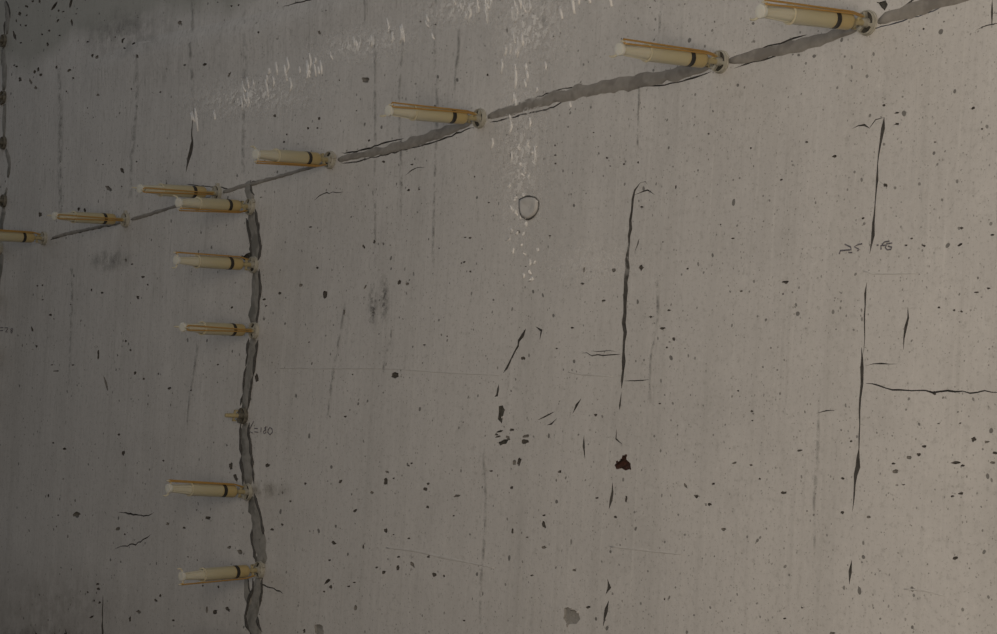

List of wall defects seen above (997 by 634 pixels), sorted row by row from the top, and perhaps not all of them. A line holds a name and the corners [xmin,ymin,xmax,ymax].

crack [979,1,997,29]
crack [0,1,11,229]
damp [190,18,405,132]
damp [425,0,591,282]
crack [0,253,8,281]
crack [51,205,176,240]
crack [186,0,969,634]
crack [852,283,997,511]
crack [117,512,151,548]